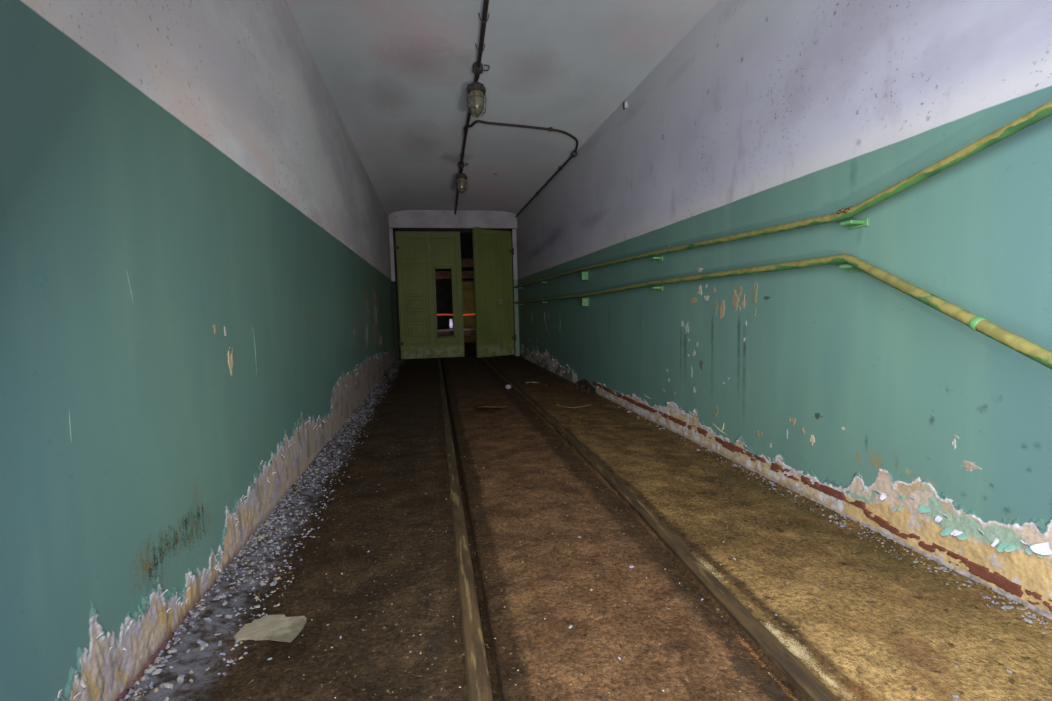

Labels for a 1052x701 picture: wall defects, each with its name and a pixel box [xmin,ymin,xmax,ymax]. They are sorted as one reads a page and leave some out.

peeling [596,369,1052,619]